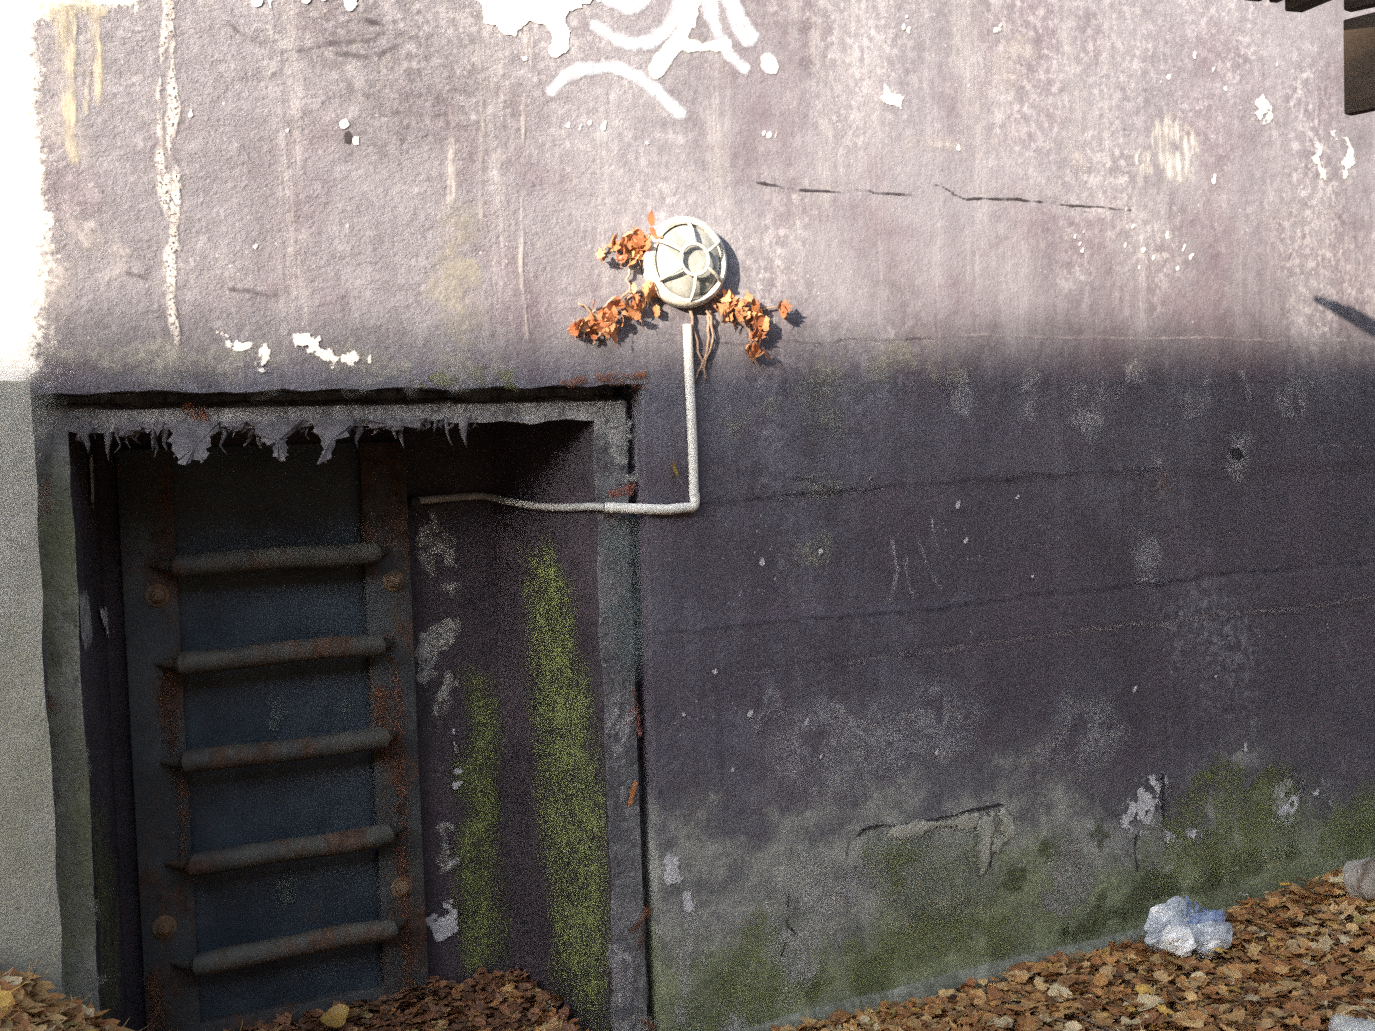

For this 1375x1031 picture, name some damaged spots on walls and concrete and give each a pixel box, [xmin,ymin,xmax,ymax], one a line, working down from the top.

peeling [478,0,600,57]
peeling [1312,130,1355,179]
damp [139,0,271,374]
crack [756,181,1131,212]
peeling [216,332,270,373]
peeling [293,333,371,369]
peeling [115,417,427,466]
damp [1120,774,1202,842]
damp [1272,778,1332,827]
damp [1041,837,1094,916]
peeling [426,900,459,941]
damp [664,854,698,1022]